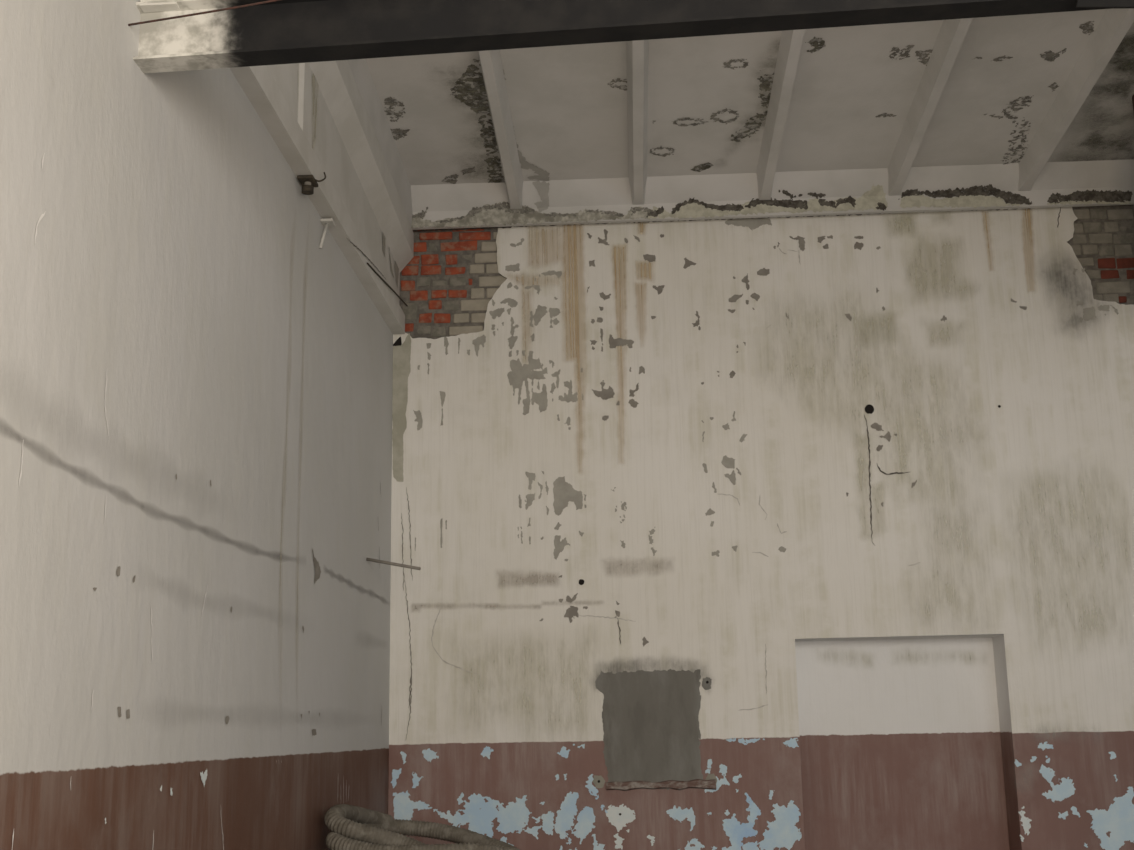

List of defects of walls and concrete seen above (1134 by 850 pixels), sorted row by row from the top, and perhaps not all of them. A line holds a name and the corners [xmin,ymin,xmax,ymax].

damp [1040,48,1066,62]
damp [1107,37,1134,95]
damp [451,59,504,183]
peeling [624,235,656,262]
flaking render [1067,205,1134,323]
flaking render [383,228,645,482]
peeling [517,471,586,561]
peeling [559,579,588,623]
flaking render [391,669,802,850]
peeling [1014,741,1134,850]